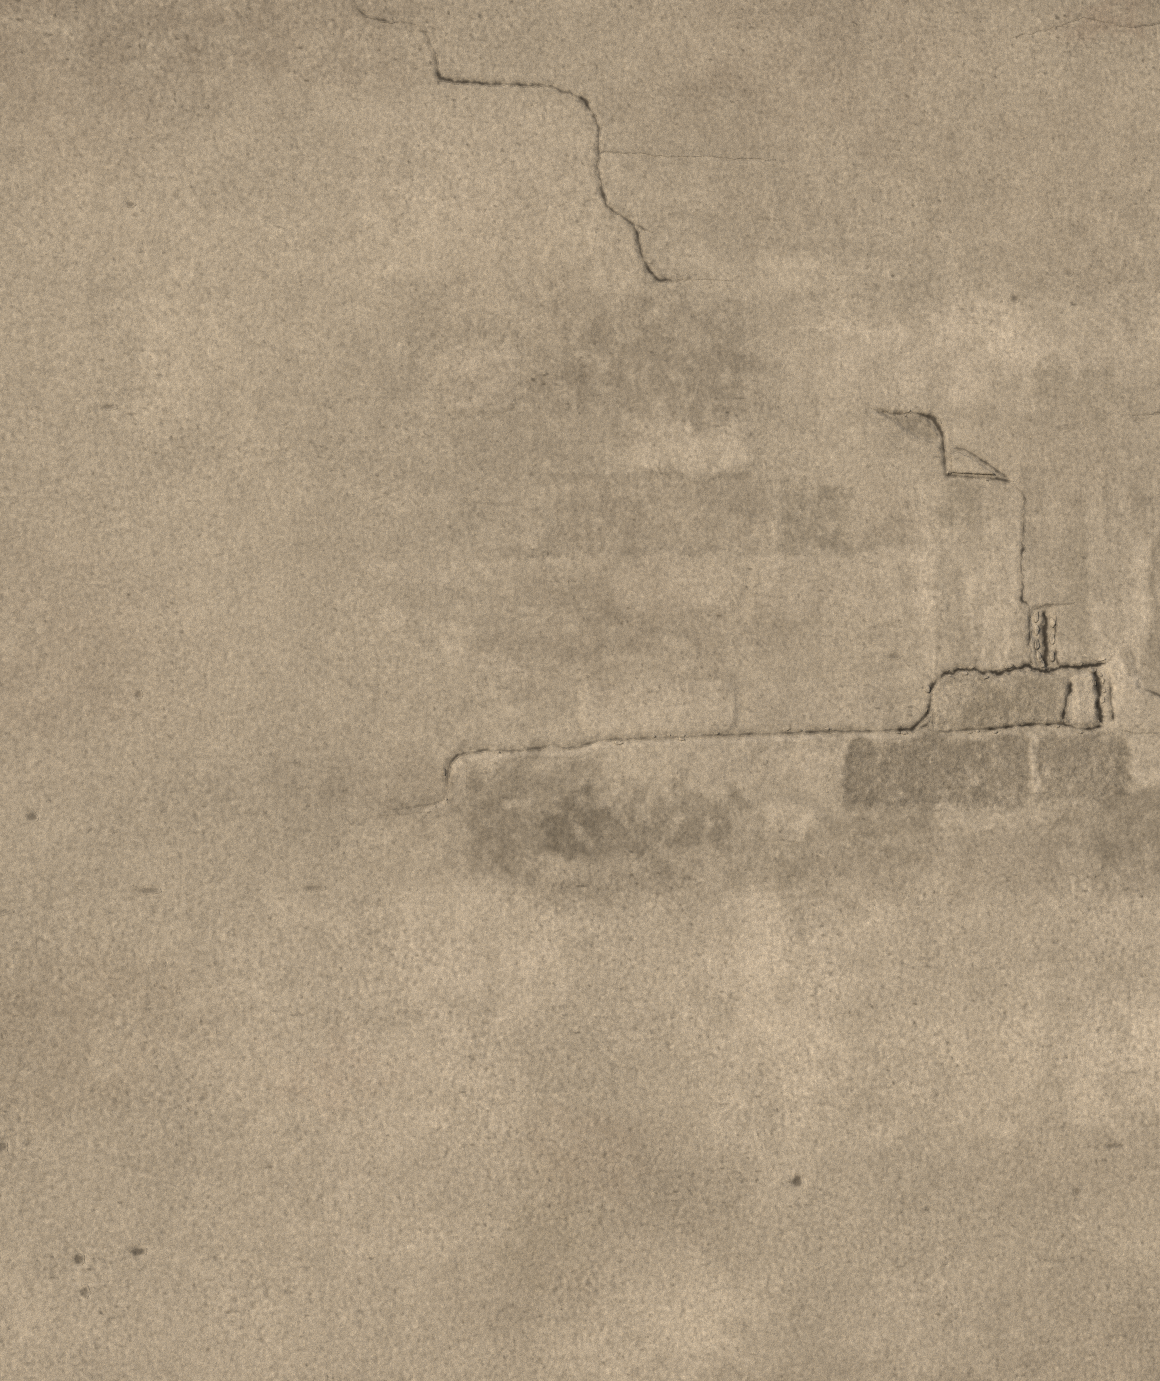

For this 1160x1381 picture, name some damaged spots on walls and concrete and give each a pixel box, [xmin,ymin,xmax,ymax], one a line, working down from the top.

crack [352,0,775,283]
peeling [626,407,756,483]
peeling [604,544,945,628]
water stain [444,733,1160,923]